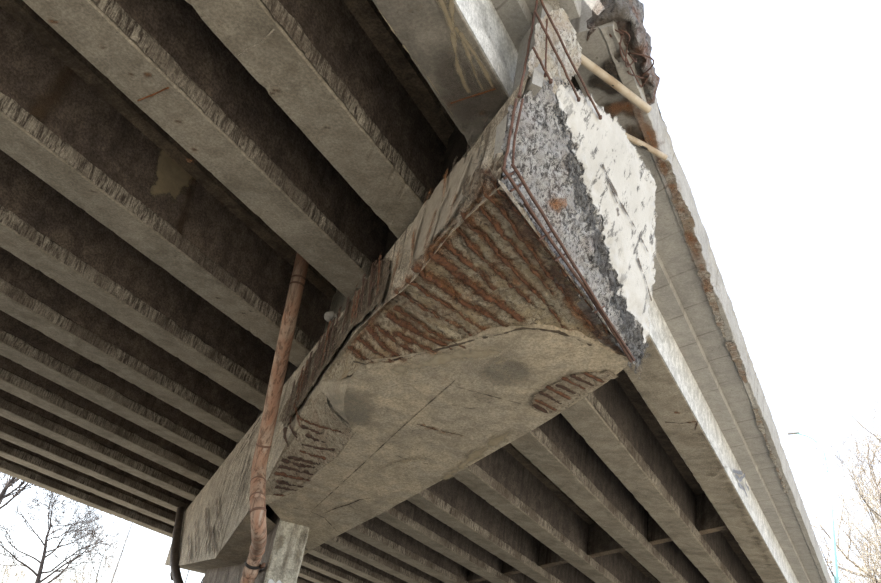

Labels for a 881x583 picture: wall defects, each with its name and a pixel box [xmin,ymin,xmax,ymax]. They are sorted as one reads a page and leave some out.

leakage [438,0,504,169]
leakage [151,150,197,234]
spalling [328,0,702,380]
spalling [697,270,748,383]
spalling [265,393,353,496]
crack [295,380,520,531]
spalling [530,370,618,414]
spalling [752,409,789,493]